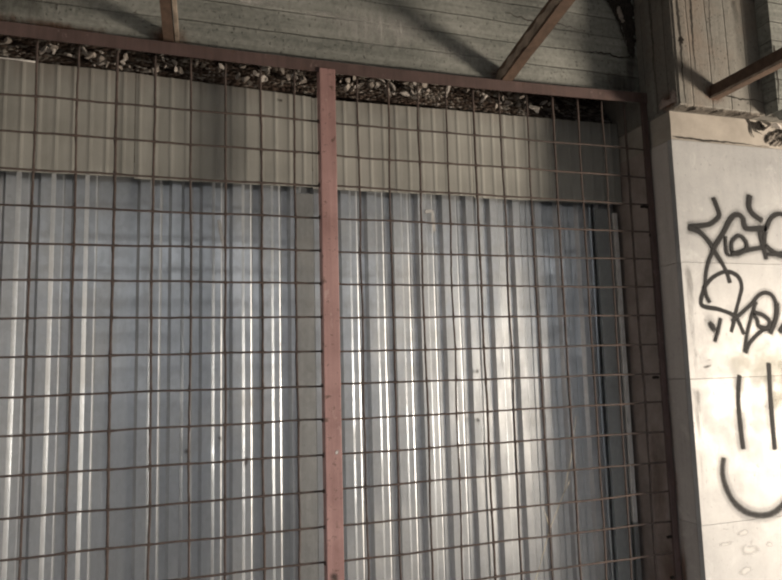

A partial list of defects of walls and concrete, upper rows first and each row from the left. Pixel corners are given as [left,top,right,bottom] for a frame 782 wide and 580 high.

spalling [589,0,636,58]
crack [676,0,715,98]
crack [727,70,779,103]
spalling [659,89,782,147]
crack [675,119,767,147]